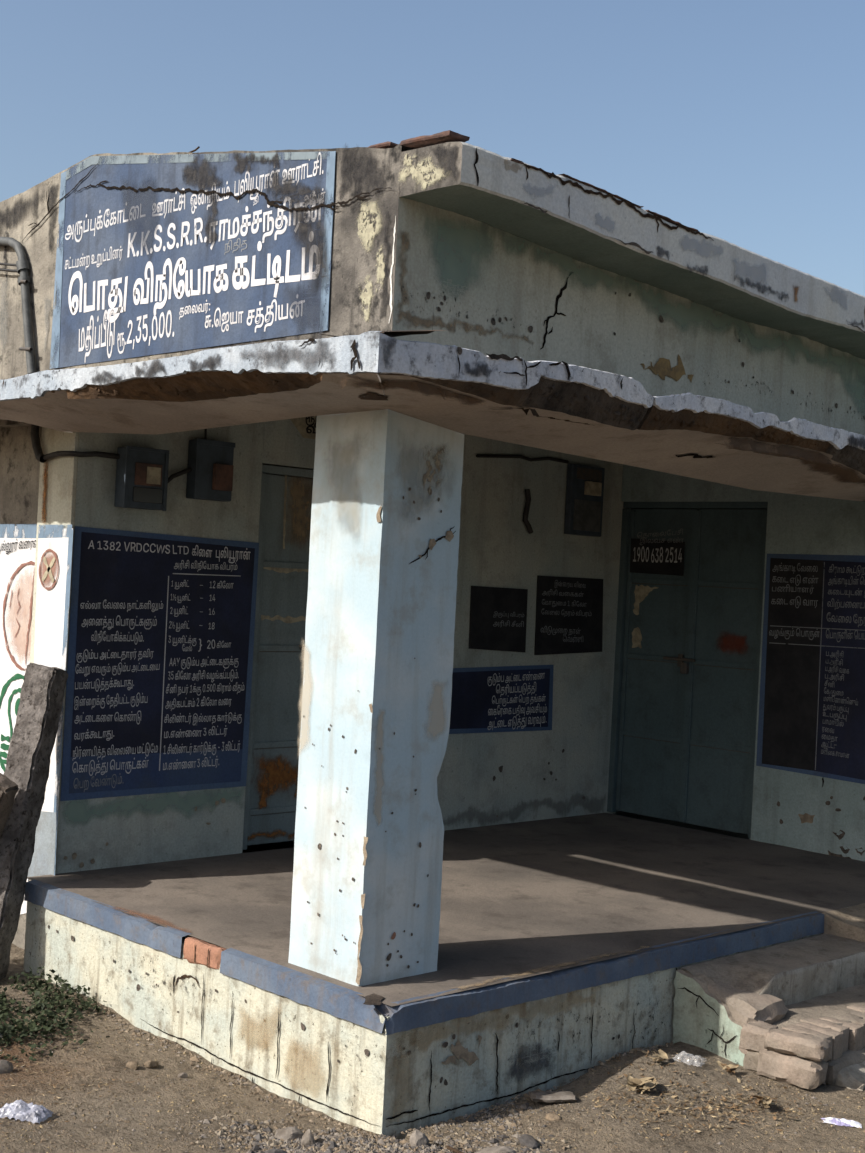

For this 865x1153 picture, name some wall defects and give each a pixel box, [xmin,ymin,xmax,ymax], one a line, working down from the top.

crack [22,161,392,241]
crack [472,148,480,186]
crack [511,158,714,241]
damp [234,145,865,420]
spalling [486,353,523,361]
crack [494,273,595,426]
peeling [640,354,693,382]
spalling [521,377,865,475]
flaking render [118,907,226,969]
crack [141,975,594,1127]
peeling [440,1034,482,1086]
crack [676,968,737,1057]